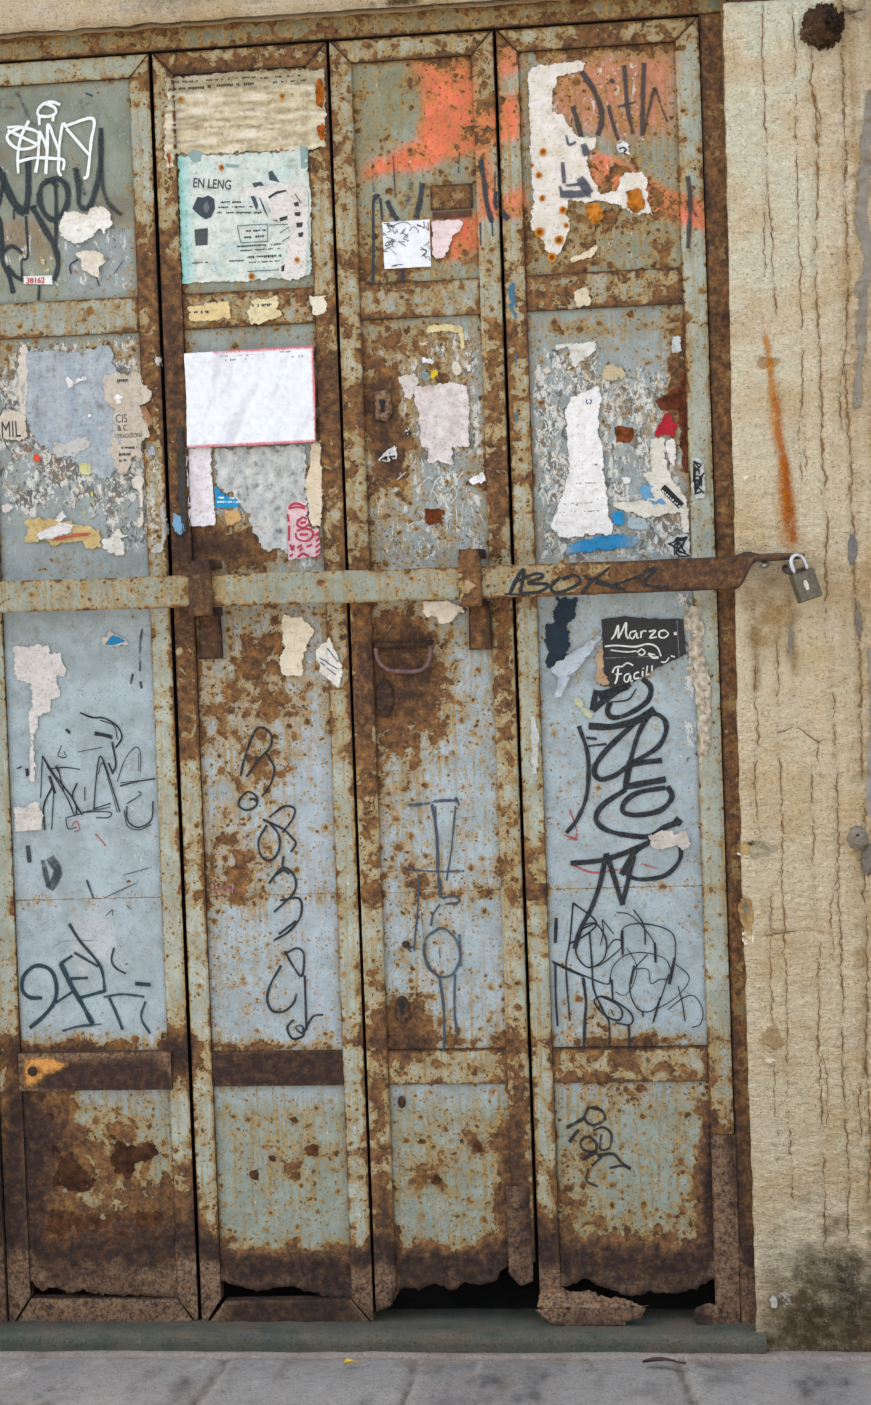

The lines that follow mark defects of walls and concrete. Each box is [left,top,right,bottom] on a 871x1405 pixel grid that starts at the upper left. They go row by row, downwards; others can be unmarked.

rust [764,336,795,542]
water stain [766,1253,871,1352]